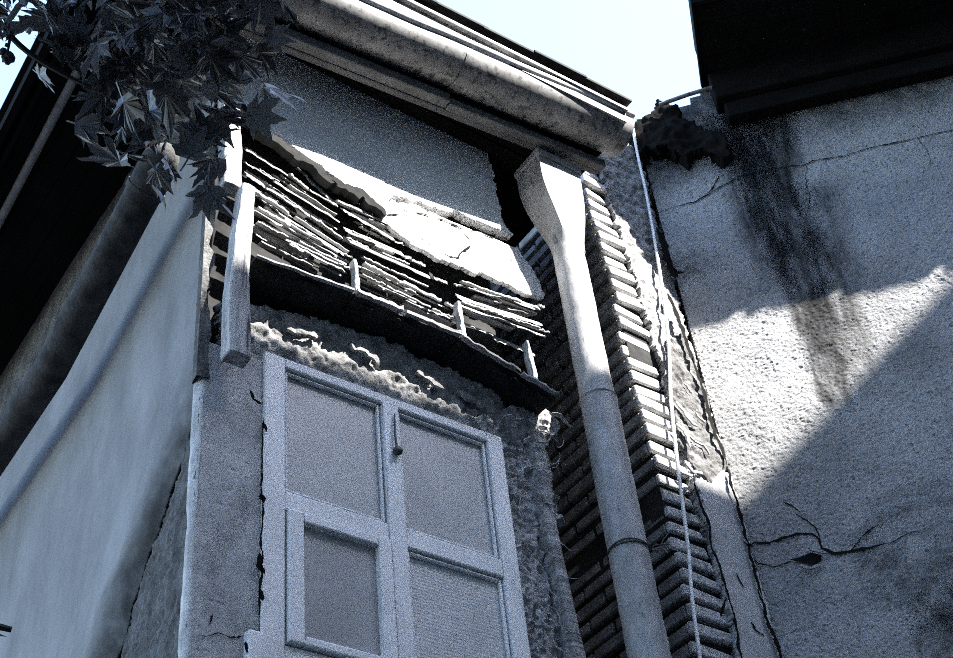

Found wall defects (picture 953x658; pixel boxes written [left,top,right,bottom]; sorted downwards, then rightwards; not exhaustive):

peeling [240,103,387,219]
leakage [725,114,854,403]
crack [656,130,952,658]